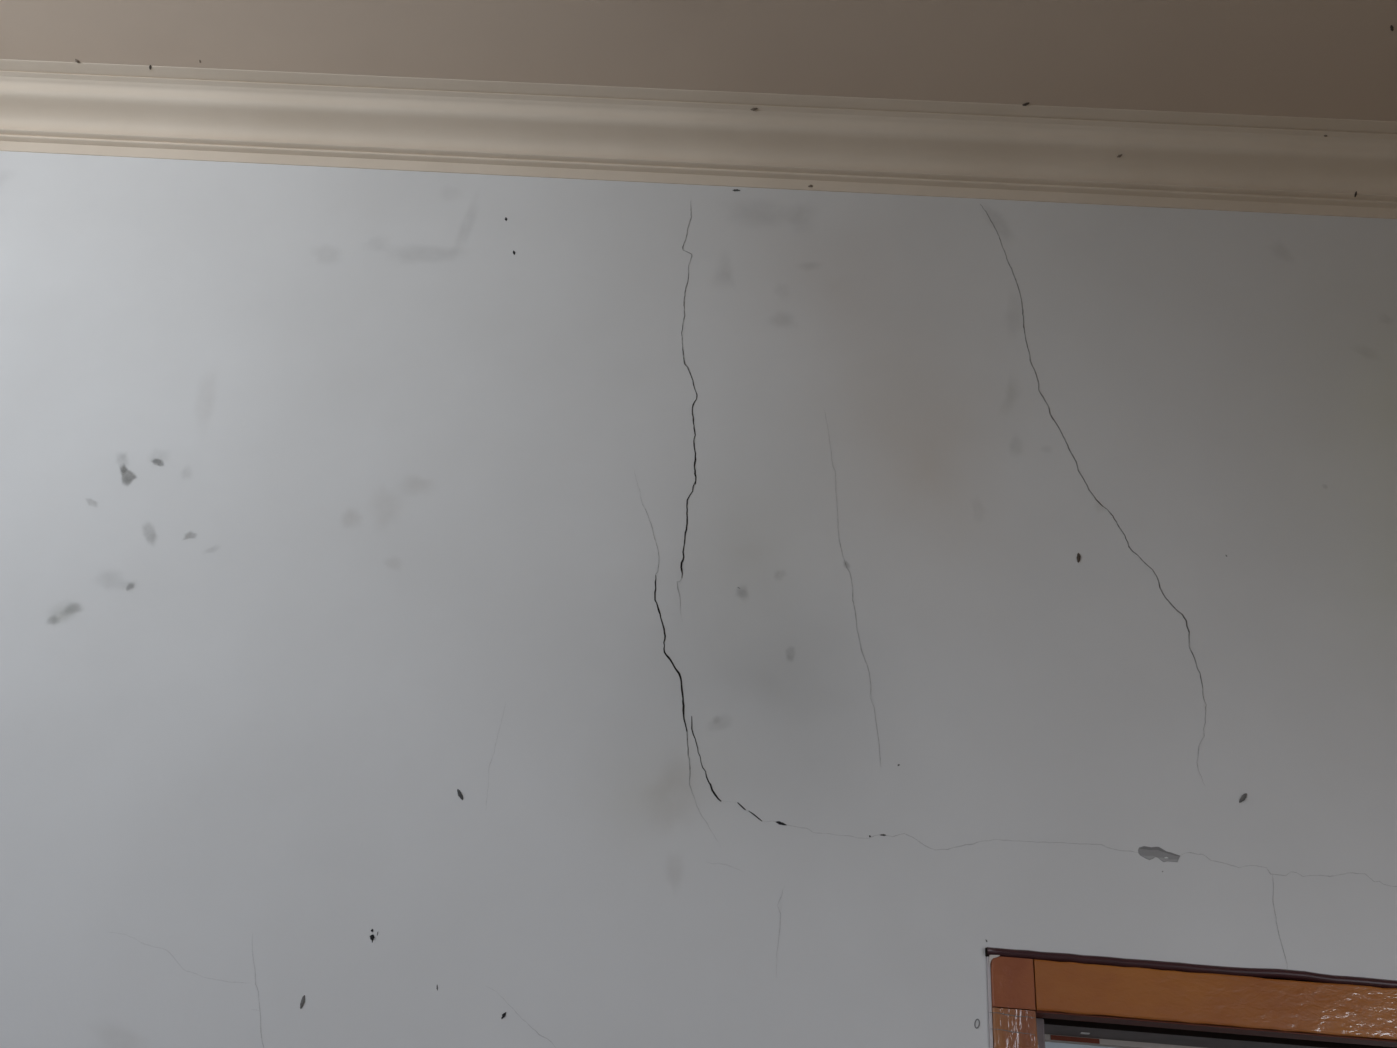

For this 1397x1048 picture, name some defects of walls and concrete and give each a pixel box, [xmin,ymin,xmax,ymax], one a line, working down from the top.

crack [654,216,762,821]
crack [1006,258,1204,698]
spalling [1138,846,1180,862]